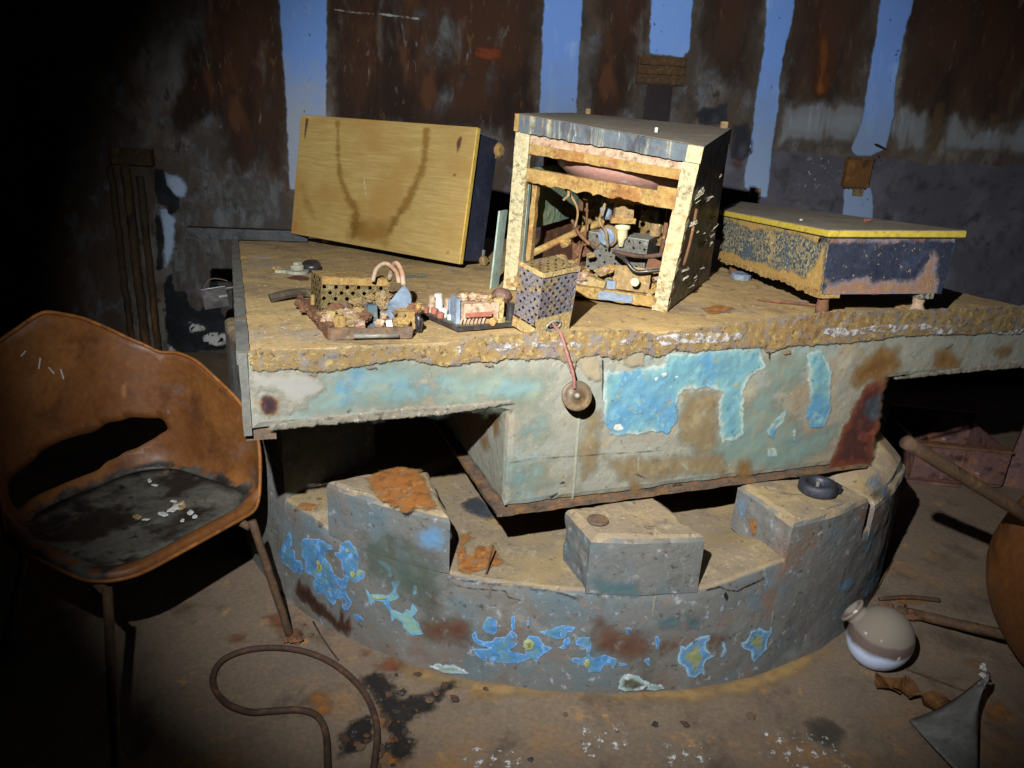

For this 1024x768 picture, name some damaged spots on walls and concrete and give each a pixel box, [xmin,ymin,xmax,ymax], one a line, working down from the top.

rust [786,0,869,103]
rust [261,395,278,416]
spalling [247,305,1024,469]
rust [828,347,900,469]
rust [365,467,437,513]
rust [457,532,503,574]
peeling [280,532,423,636]
peeling [472,616,627,673]
leakage [618,674,665,691]
peeling [677,635,727,678]
peeling [741,627,772,662]
leakage [339,664,468,760]